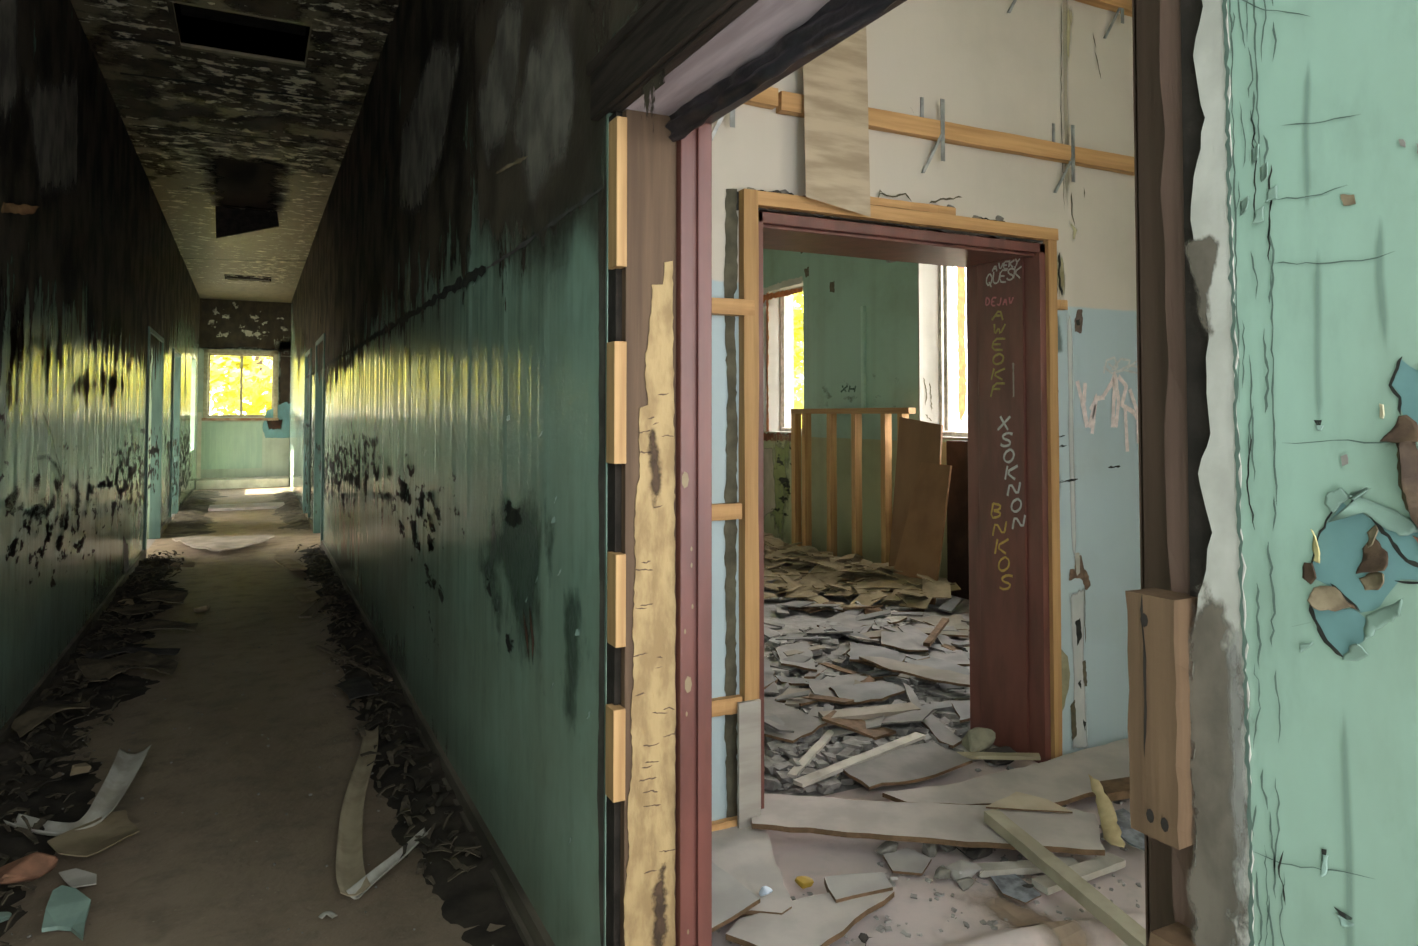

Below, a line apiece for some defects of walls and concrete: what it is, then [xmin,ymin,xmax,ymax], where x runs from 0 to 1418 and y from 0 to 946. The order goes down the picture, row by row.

peeling [0,0,78,215]
peeling [79,0,398,286]
crack [1229,0,1394,946]
peeling [1300,357,1418,661]
spalling [1334,907,1354,926]